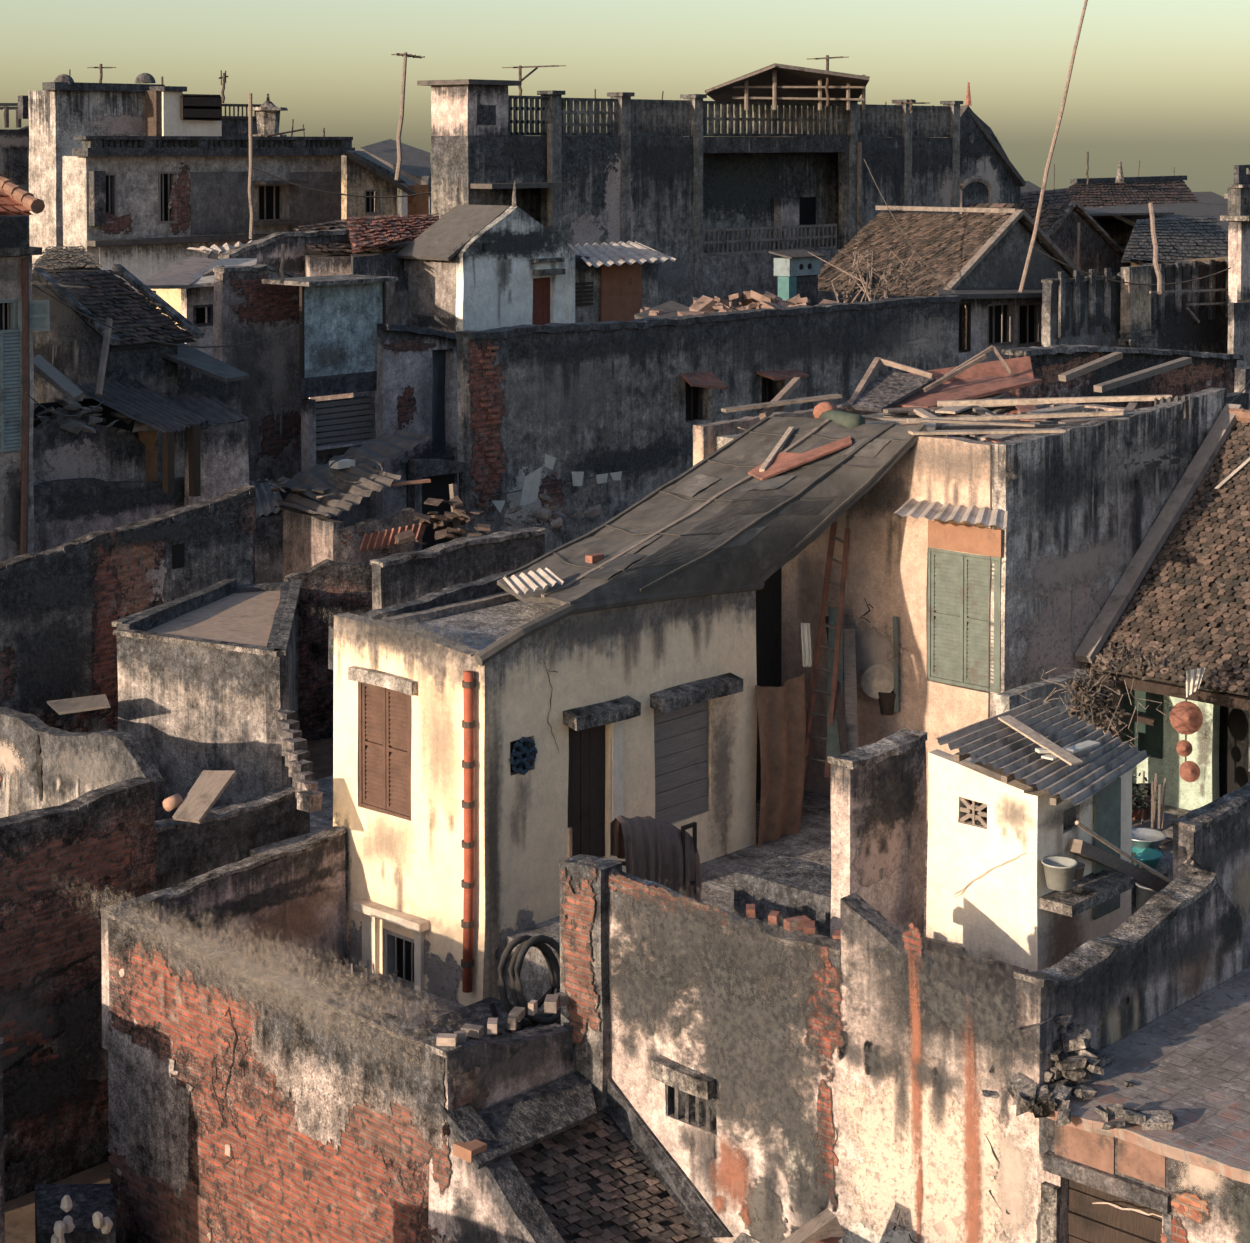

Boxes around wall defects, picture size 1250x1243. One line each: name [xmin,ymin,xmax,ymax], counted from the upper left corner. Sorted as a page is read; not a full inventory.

water stain [454,225,573,287]
spalling [91,517,175,710]
crack [543,659,559,751]
water stain [1025,438,1199,647]
spalling [0,827,171,996]
spalling [88,940,451,1243]
spalling [560,859,730,1068]
water stain [608,889,1041,1233]
peeling [738,946,1031,1243]
corrosion [909,968,923,1243]
corrosion [963,1044,981,1243]
crack [953,853,1027,897]